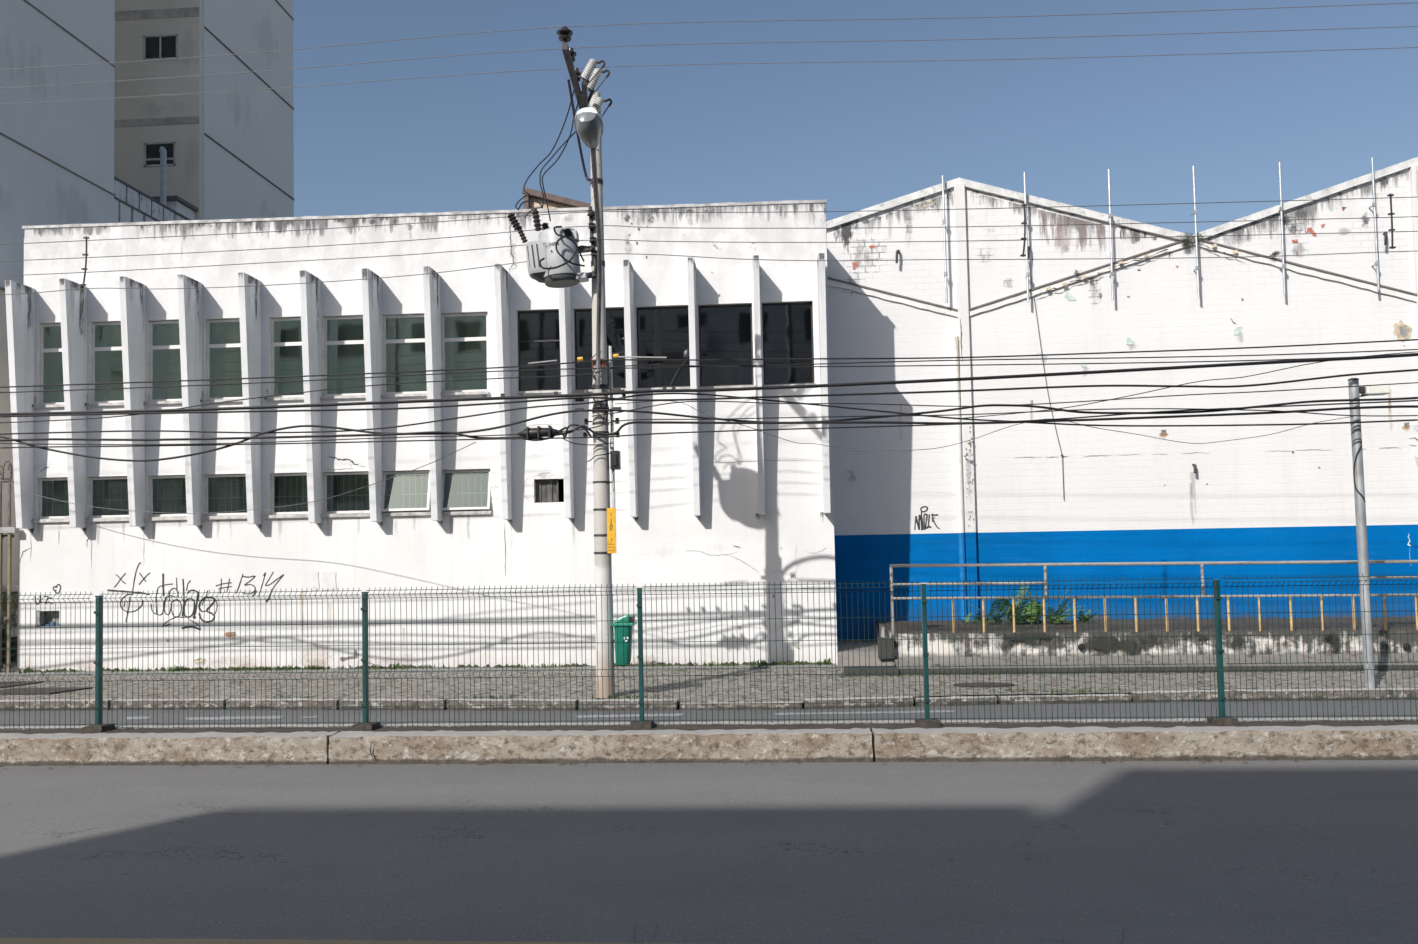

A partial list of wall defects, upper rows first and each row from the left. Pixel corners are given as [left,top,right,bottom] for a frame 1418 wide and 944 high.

damp [622,206,721,223]
damp [1120,226,1152,250]